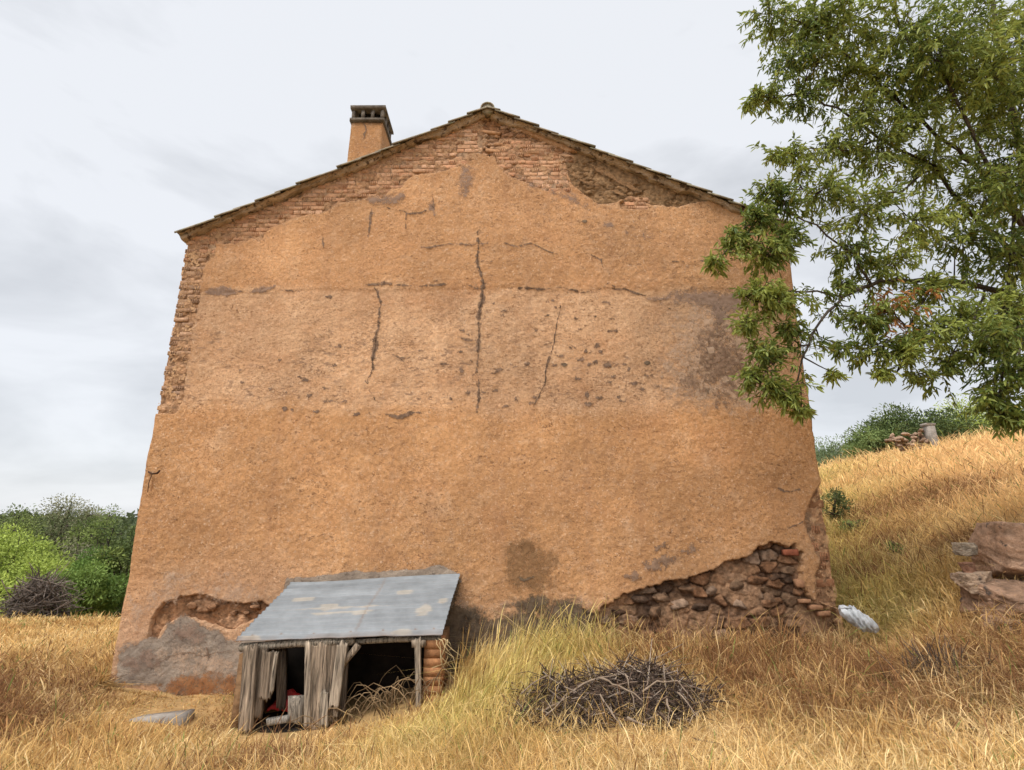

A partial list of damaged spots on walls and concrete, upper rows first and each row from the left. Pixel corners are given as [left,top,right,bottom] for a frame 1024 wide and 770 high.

flaking render [157,118,702,414]
crack [365,196,557,419]
crack [518,254,649,404]
spalling [152,594,269,638]
damp [445,538,596,675]
spalling [583,487,838,646]